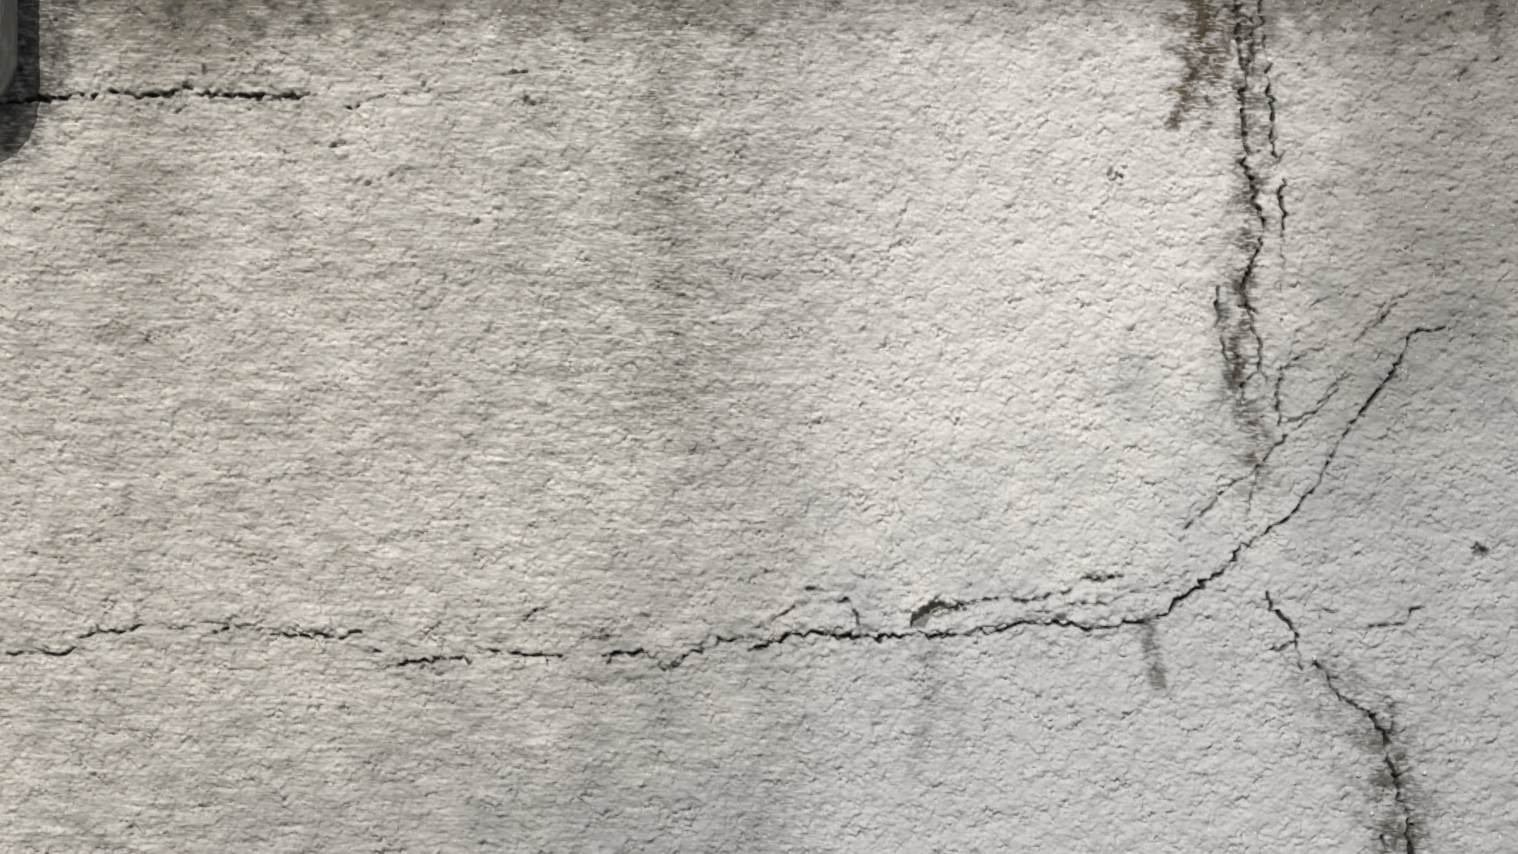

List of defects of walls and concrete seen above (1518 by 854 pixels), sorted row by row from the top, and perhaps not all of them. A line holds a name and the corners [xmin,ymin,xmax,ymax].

crack [6,68,360,147]
crack [592,0,1445,671]
crack [7,624,142,656]
crack [276,608,561,666]
crack [1266,592,1427,854]